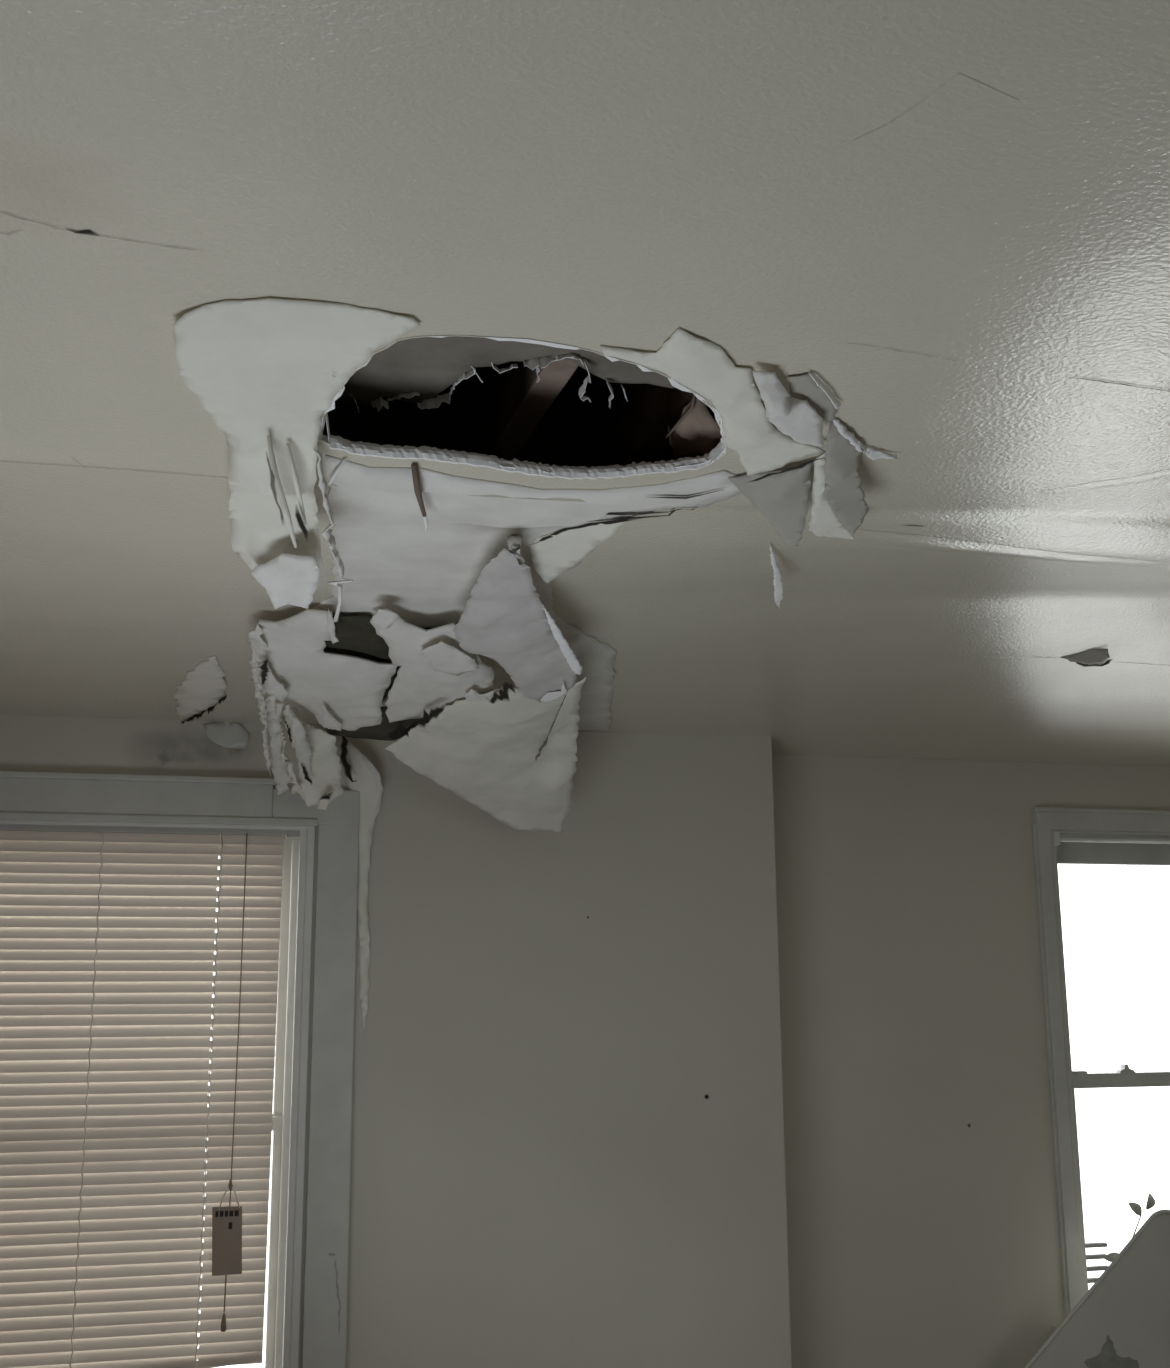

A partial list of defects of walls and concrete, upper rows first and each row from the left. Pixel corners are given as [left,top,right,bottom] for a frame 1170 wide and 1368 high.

crack [70,229,96,237]
flaking render [173,298,898,1034]